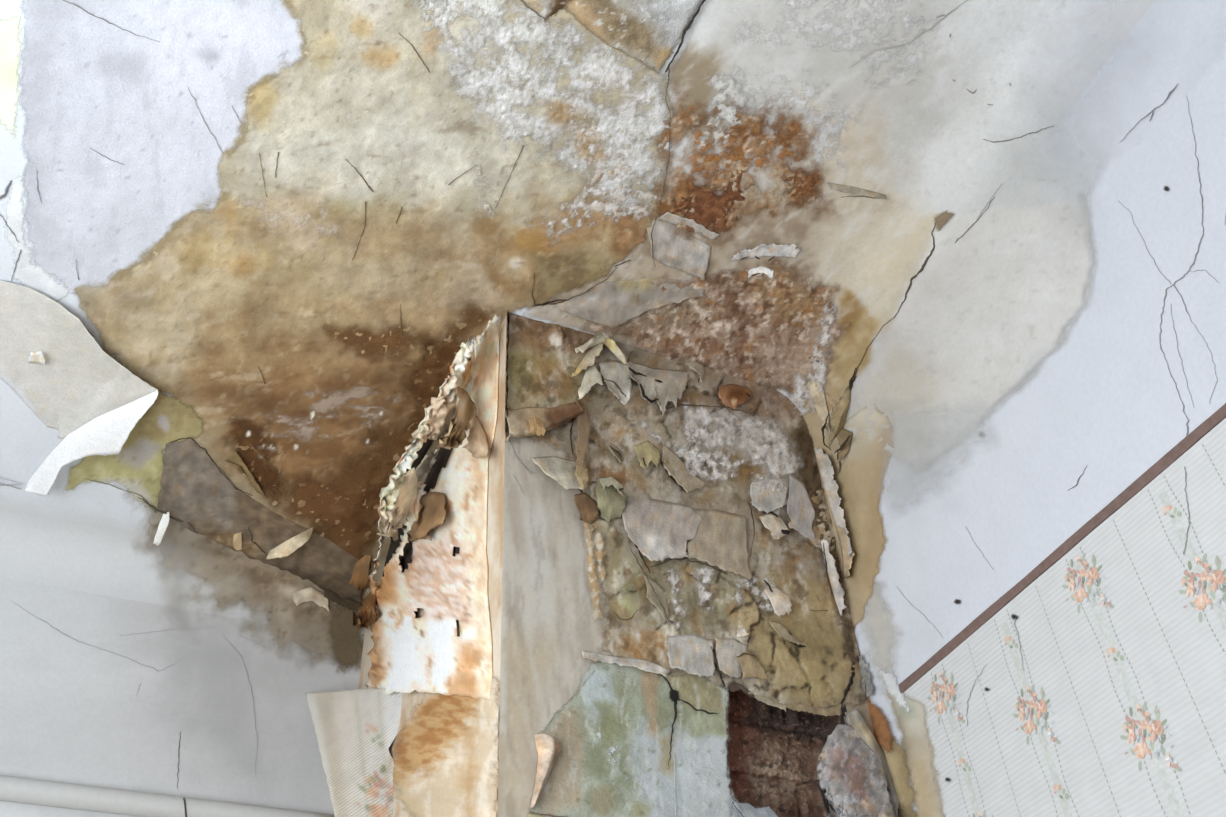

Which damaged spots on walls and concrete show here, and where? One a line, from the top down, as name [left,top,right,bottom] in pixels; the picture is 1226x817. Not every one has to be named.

peeling [0,0,305,497]
water stain [74,0,1103,709]
peeling [532,212,758,416]
crack [660,0,706,204]
rust [649,69,829,235]
peeling [730,243,803,279]
crack [1120,83,1226,436]
peeling [352,310,510,699]
peeling [529,379,855,817]
crack [1182,466,1190,554]
crack [659,649,725,769]